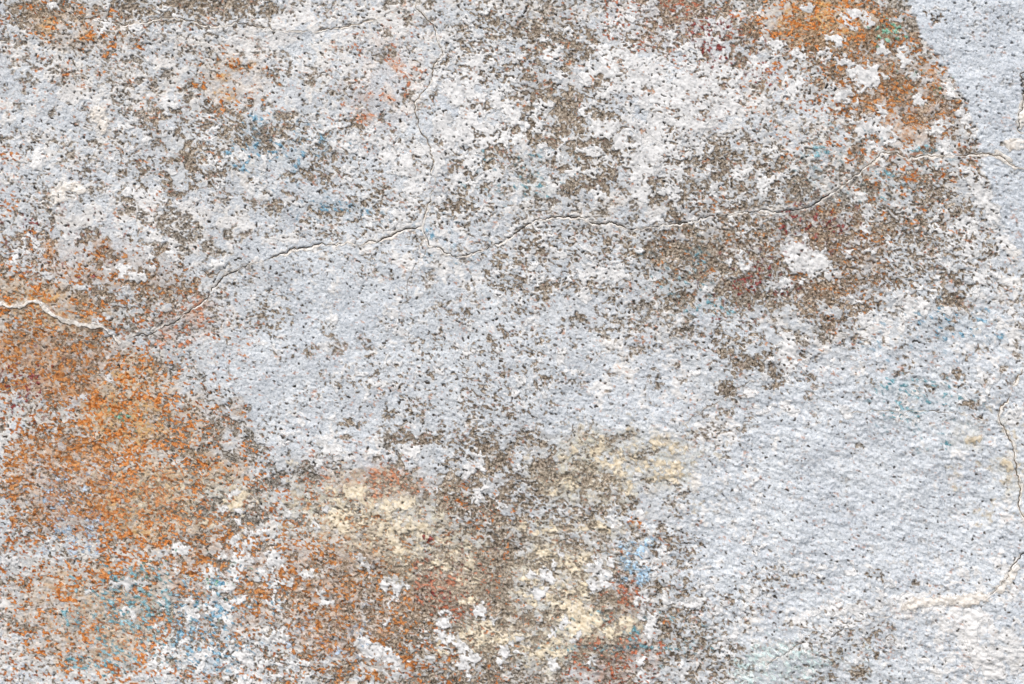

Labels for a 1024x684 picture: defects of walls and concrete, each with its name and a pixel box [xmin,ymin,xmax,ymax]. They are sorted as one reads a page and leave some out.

corrosion [597,0,968,154]
crack [0,0,1024,345]
corrosion [0,226,492,684]
crack [791,365,1024,523]
crack [986,553,1024,599]